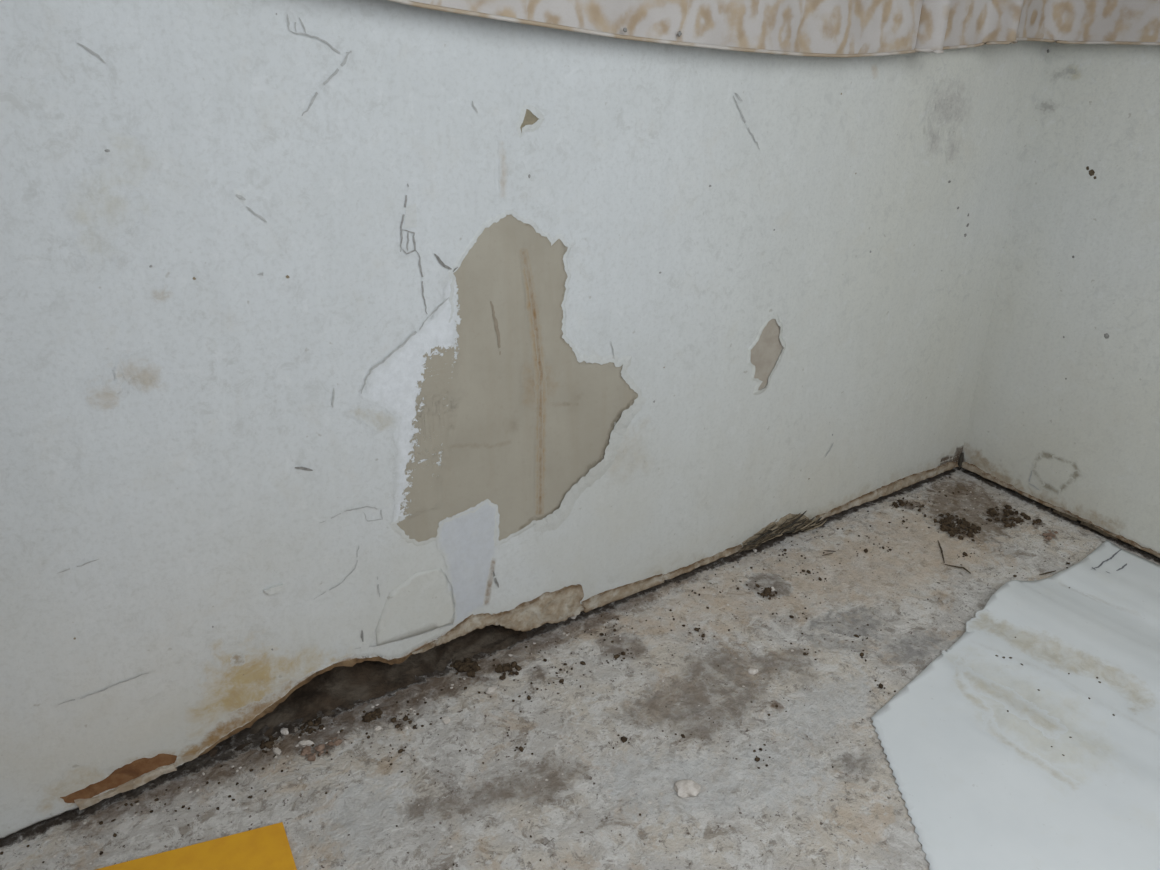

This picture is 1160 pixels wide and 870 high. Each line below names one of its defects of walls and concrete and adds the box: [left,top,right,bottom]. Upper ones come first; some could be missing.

peeling [516,104,545,138]
peeling [359,209,647,547]
peeling [747,314,786,395]
flaking render [191,450,1160,761]
flaking render [74,763,177,810]